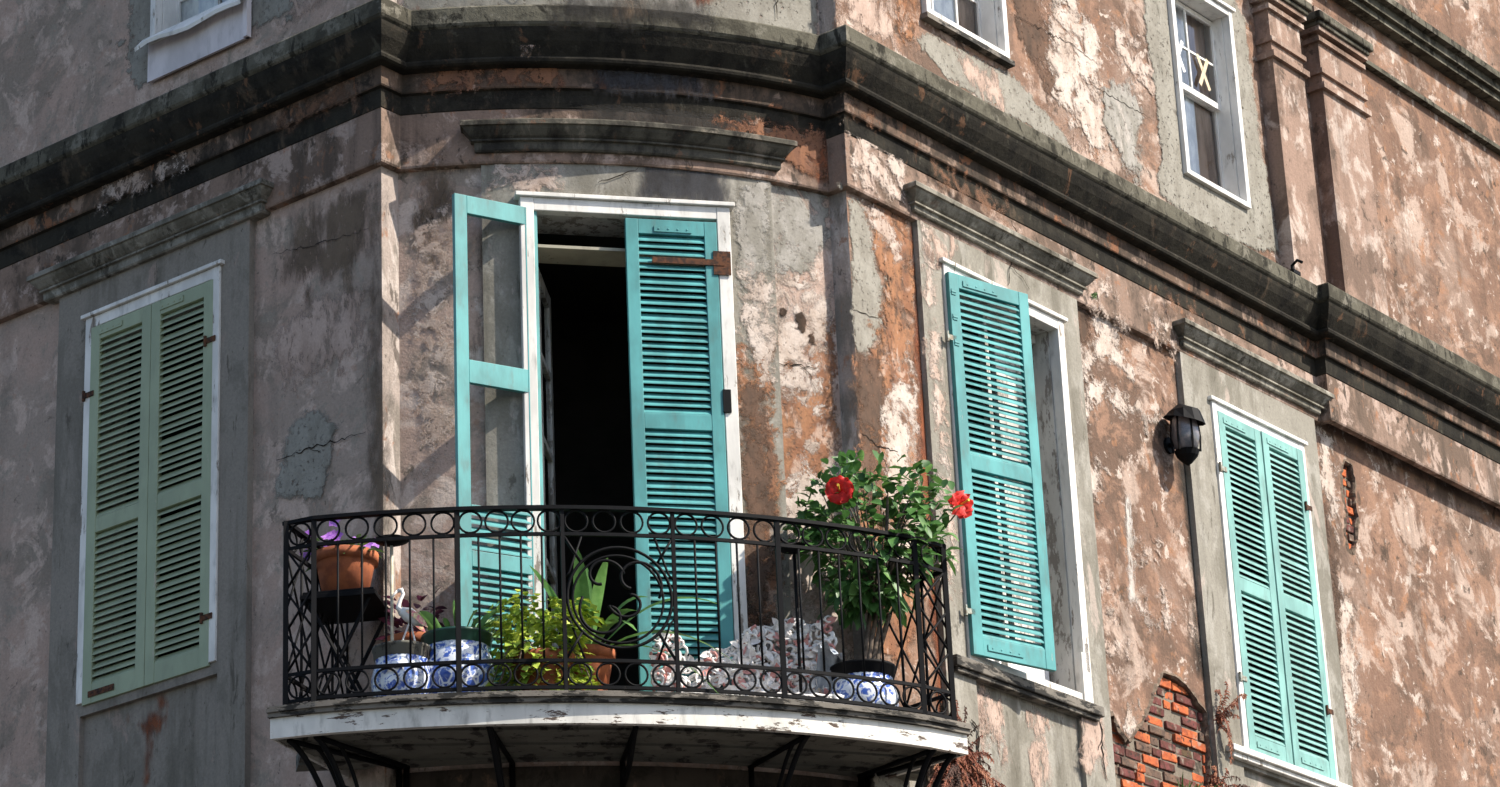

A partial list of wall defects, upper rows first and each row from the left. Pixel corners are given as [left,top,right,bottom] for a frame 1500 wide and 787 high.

rust [420,68,564,96]
peeling [1045,0,1160,161]
peeling [735,131,964,666]
peeling [1080,277,1170,438]
peeling [1090,456,1112,503]
flaking render [1315,425,1360,555]
peeling [1100,577,1196,680]
peeling [927,683,1008,787]
peeling [1026,709,1051,787]
flaking render [1079,671,1213,787]